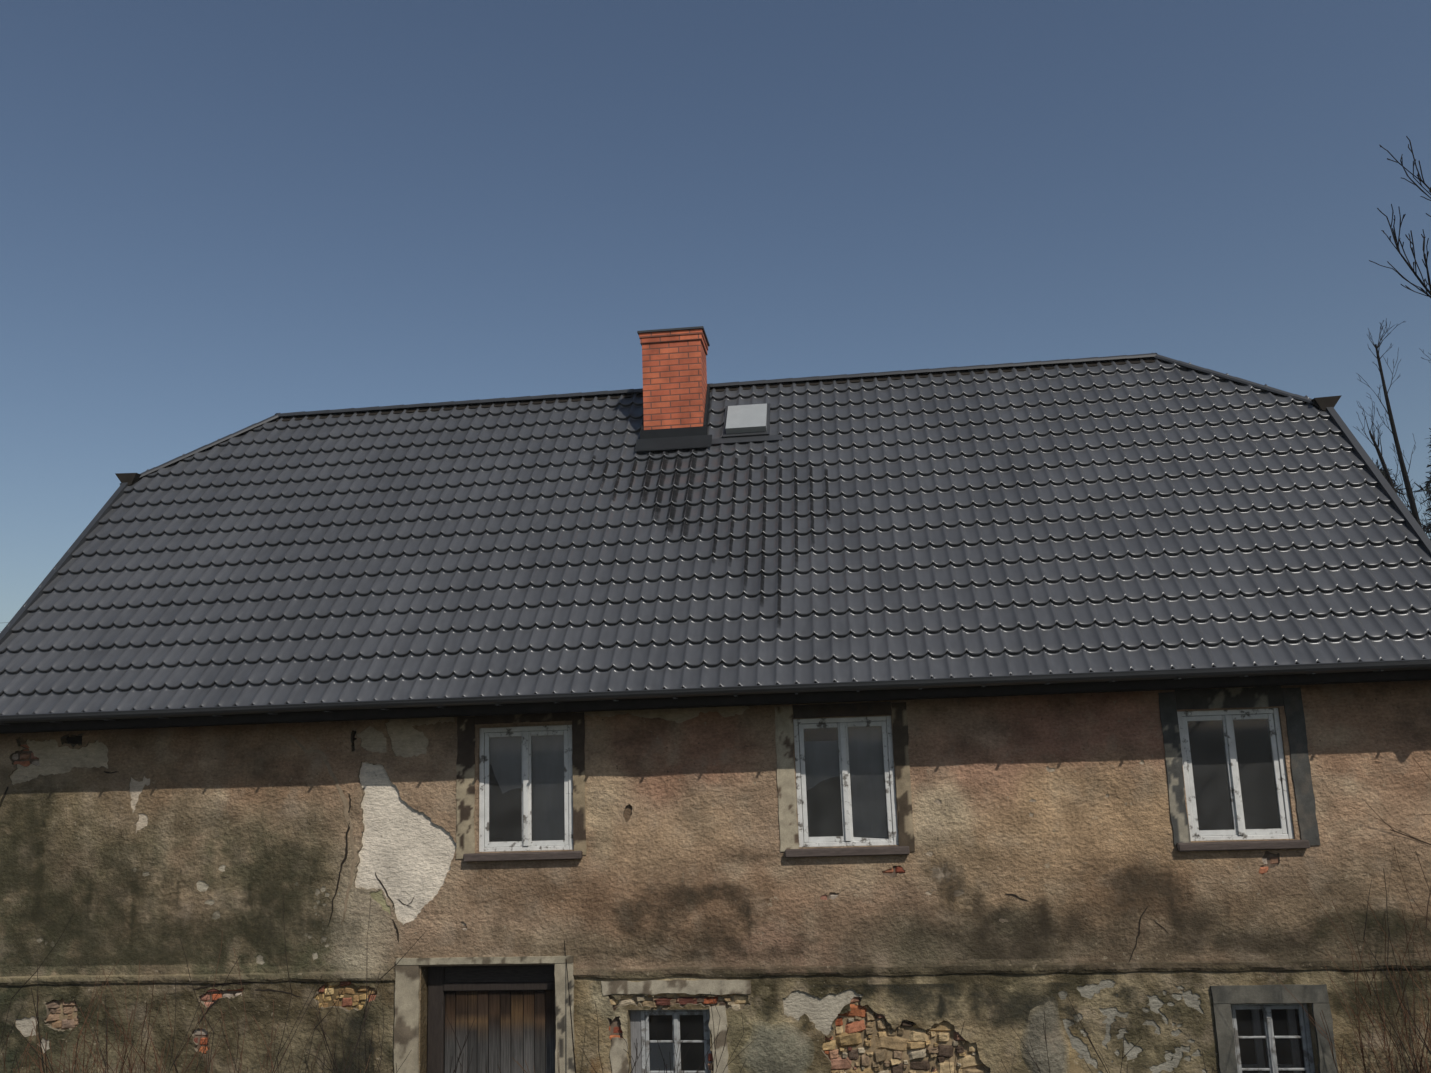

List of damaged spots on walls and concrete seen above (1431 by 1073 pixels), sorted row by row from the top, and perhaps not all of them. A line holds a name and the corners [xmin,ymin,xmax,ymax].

flaking render [9,733,108,785]
flaking render [196,880,220,920]
crack [327,793,414,942]
flaking render [304,717,456,961]
flaking render [782,989,990,1073]
flaking render [1058,979,1207,1073]